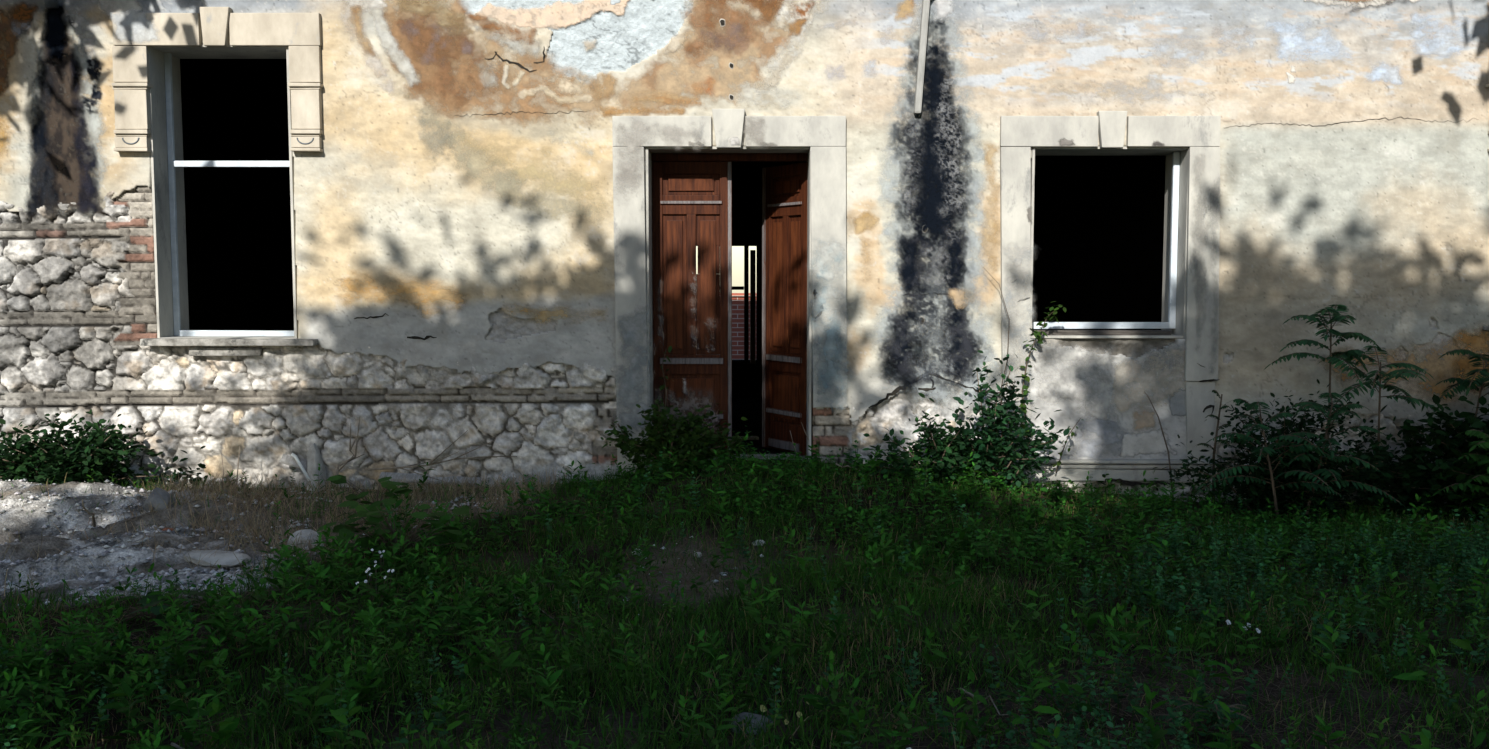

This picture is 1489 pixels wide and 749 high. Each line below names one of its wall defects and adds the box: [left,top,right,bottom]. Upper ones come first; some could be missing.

water stain [26,0,157,213]
peeling [460,0,693,83]
peeling [728,0,855,107]
water stain [875,0,1033,454]
spalling [486,308,557,343]